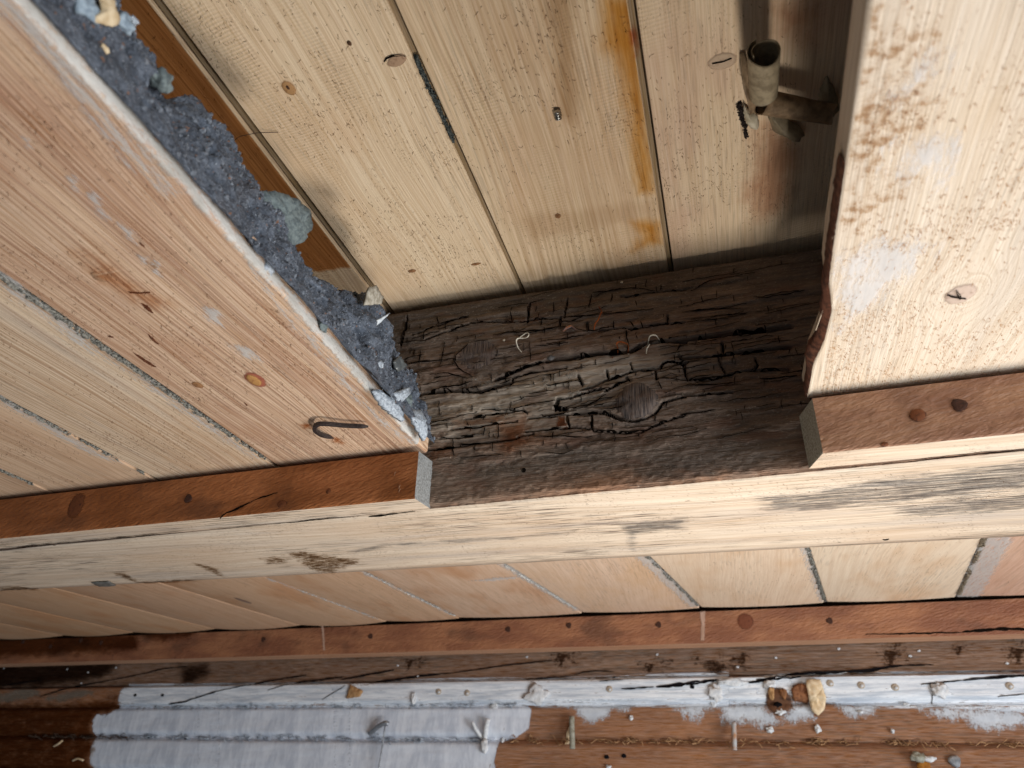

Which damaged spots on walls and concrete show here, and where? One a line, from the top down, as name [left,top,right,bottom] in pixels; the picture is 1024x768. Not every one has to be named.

crack [398,272,797,458]
crack [217,492,415,530]
crack [0,532,183,551]
crack [866,627,1024,635]